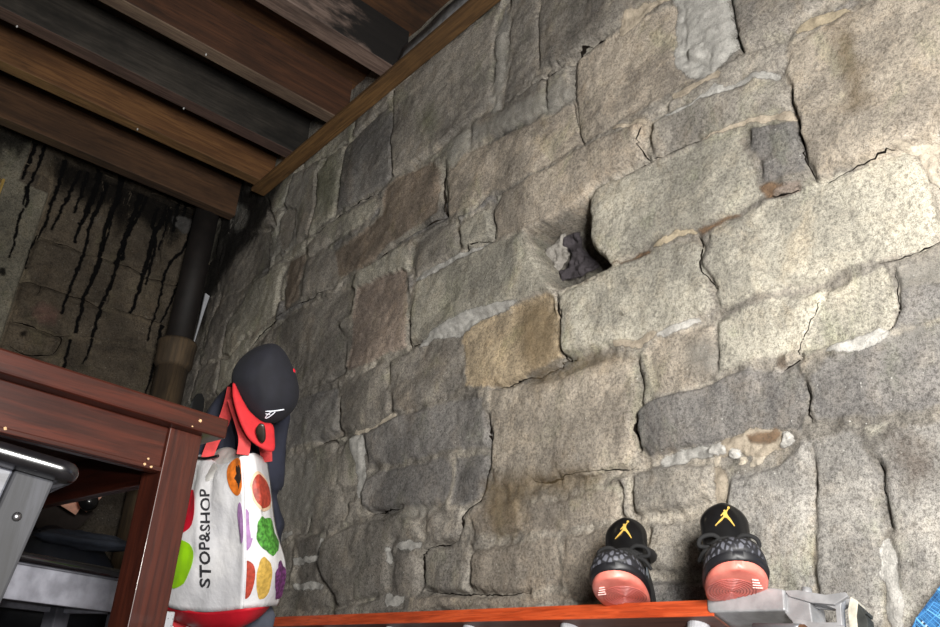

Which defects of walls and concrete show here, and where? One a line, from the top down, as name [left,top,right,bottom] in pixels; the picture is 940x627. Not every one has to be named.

leakage [0,130,46,258]
leakage [25,159,195,368]
spalling [545,232,600,281]